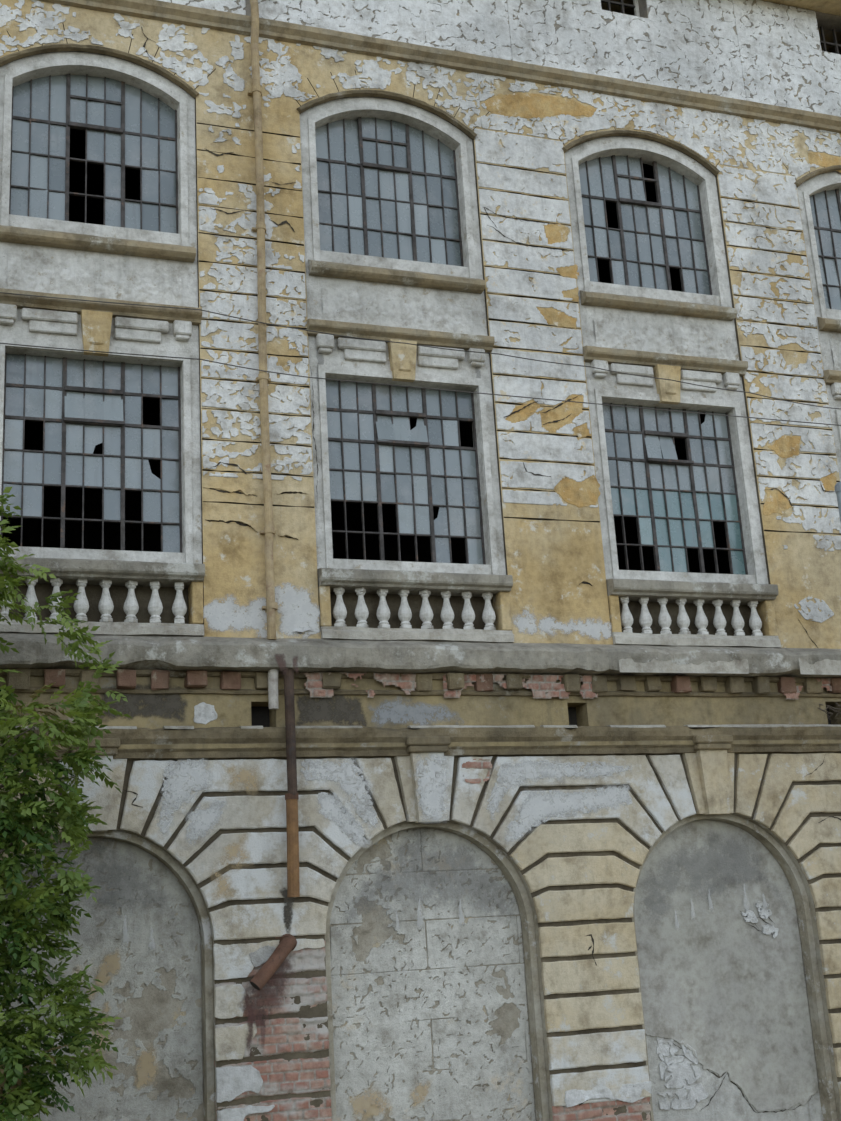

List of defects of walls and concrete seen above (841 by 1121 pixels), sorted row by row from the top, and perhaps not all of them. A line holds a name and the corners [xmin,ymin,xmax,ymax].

peeling [0,0,104,56]
peeling [113,0,841,551]
flaking render [794,597,834,623]
flaking render [300,672,416,698]
flaking render [522,674,598,699]
spalling [619,658,749,674]
spalling [784,658,841,700]
peeling [462,759,633,841]
flaking render [0,756,536,1121]
flaking render [742,901,779,938]
flaking render [551,1037,708,1121]
crack [664,1038,812,1113]